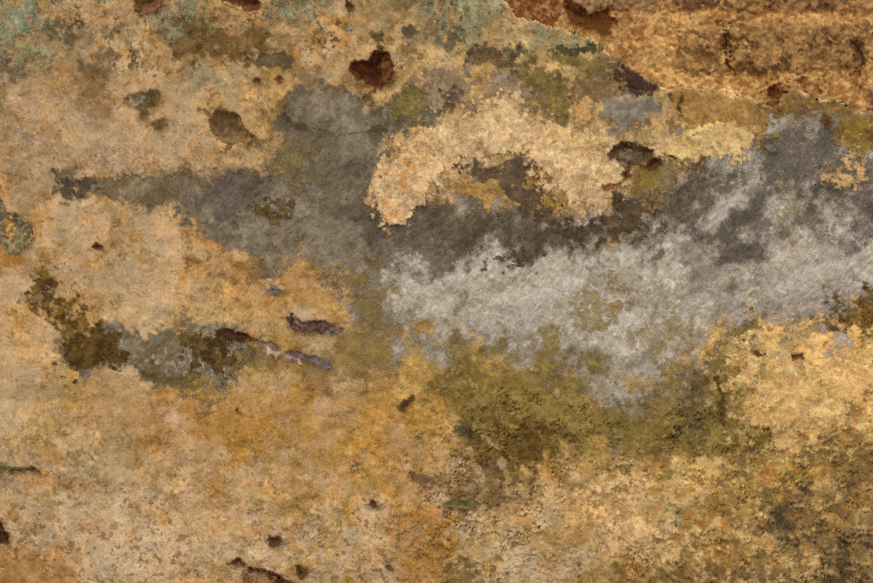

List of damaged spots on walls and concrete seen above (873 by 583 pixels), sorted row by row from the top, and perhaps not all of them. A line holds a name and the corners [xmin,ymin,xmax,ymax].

spalling [563,0,621,35]
peeling [350,51,395,106]
peeling [208,130,227,152]
water stain [17,0,873,473]
spalling [286,312,344,337]
spalling [218,327,334,373]
water stain [408,391,576,518]
water stain [609,427,873,583]
spalling [0,521,9,545]
spalling [226,559,308,583]
water stain [419,534,500,583]